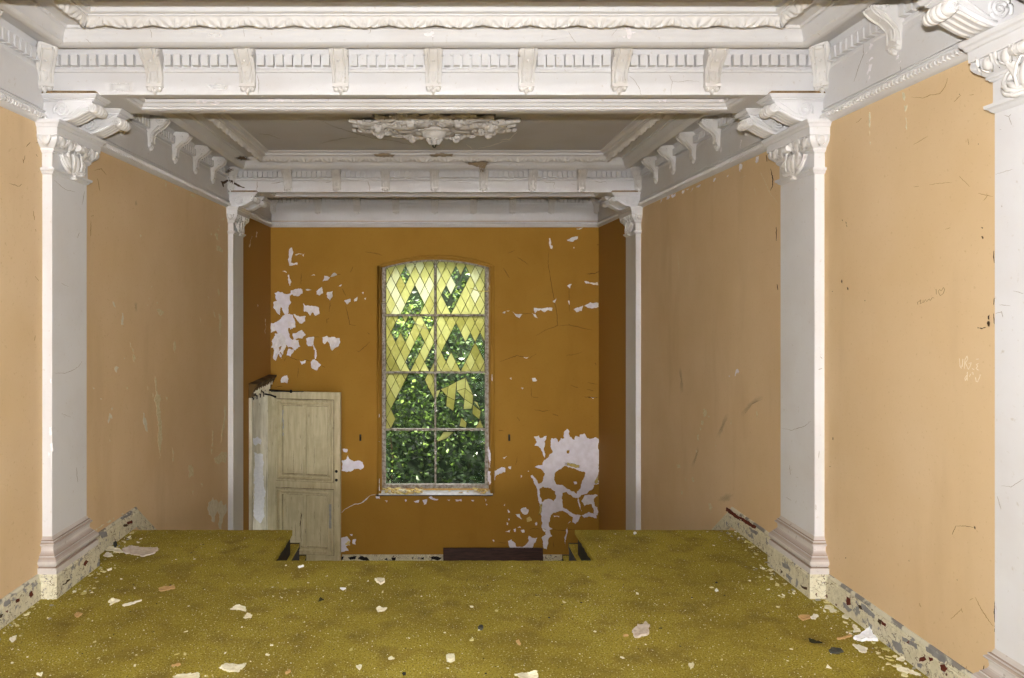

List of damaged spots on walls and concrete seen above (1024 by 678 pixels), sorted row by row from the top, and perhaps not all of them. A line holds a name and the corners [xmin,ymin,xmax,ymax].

peeling [265,248,366,370]
peeling [503,299,599,318]
peeling [342,449,364,472]
peeling [488,429,599,549]